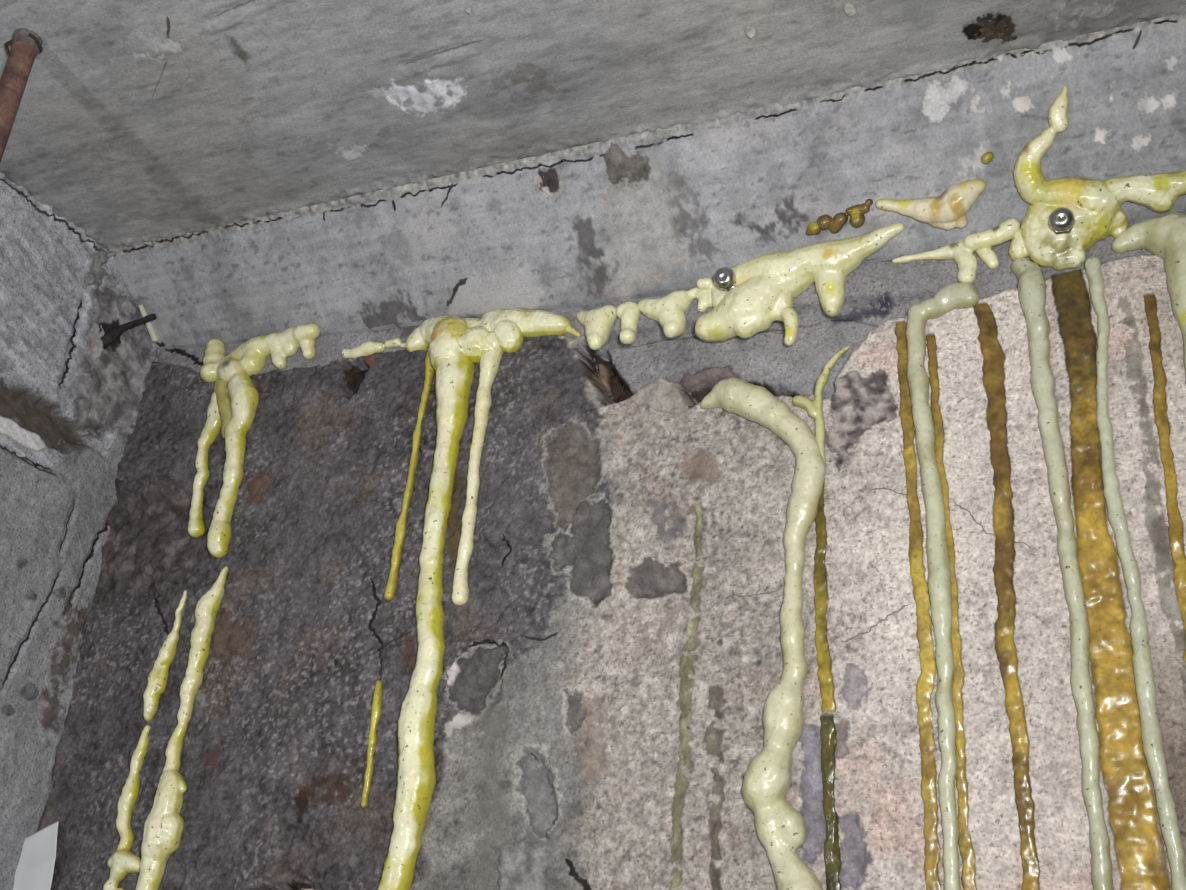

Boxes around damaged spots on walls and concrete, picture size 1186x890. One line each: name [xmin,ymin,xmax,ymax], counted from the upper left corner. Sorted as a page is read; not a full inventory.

efflorescence [369,66,467,117]
crack [756,20,1177,120]
crack [484,154,605,178]
crack [635,134,693,149]
crack [0,178,283,252]
crack [323,183,457,221]
crack [59,300,82,389]